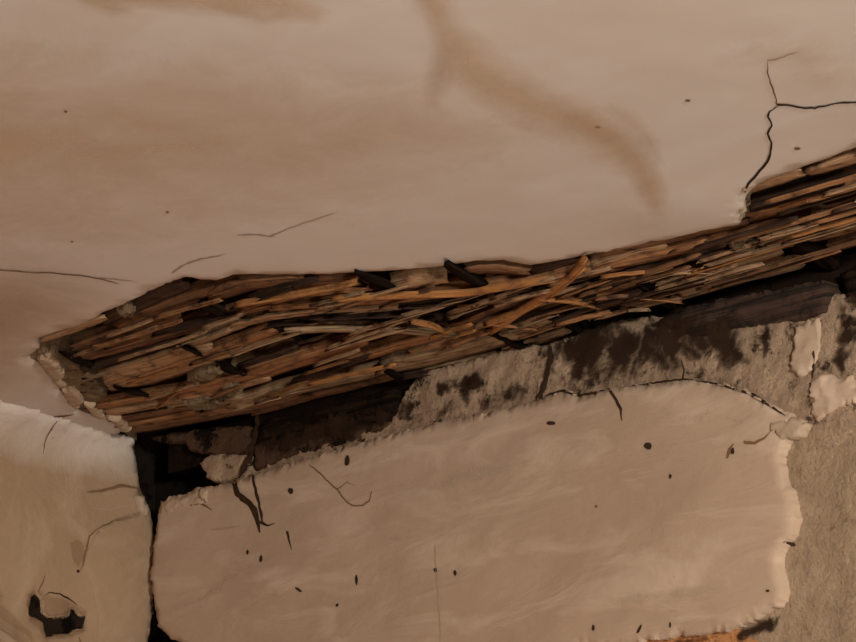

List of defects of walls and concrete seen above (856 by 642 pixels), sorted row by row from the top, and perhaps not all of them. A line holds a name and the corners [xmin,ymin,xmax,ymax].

crack [744,51,856,193]
spalling [739,187,752,225]
crack [0,270,133,284]
spalling [29,340,137,440]
leakage [437,373,537,417]
leakage [543,310,749,387]
leakage [762,322,770,357]
spalling [770,318,856,441]
leakage [832,294,856,372]
crack [190,414,292,550]
crack [309,464,372,506]
spalling [29,595,85,637]